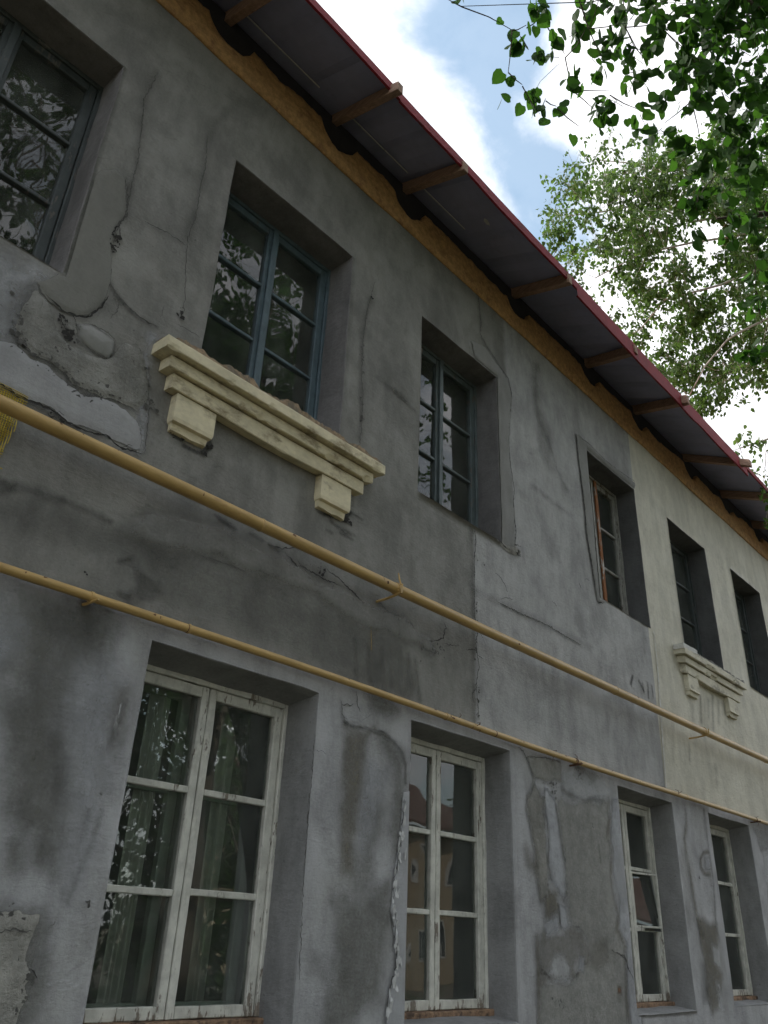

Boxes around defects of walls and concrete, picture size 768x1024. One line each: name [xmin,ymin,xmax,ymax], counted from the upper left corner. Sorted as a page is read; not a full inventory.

crack [110,75,208,336]
spalling [9,290,159,413]
crack [269,531,483,717]
water stain [342,722,406,867]
spalling [0,903,55,1024]
peeling [386,791,409,1024]
water stain [537,779,642,1024]